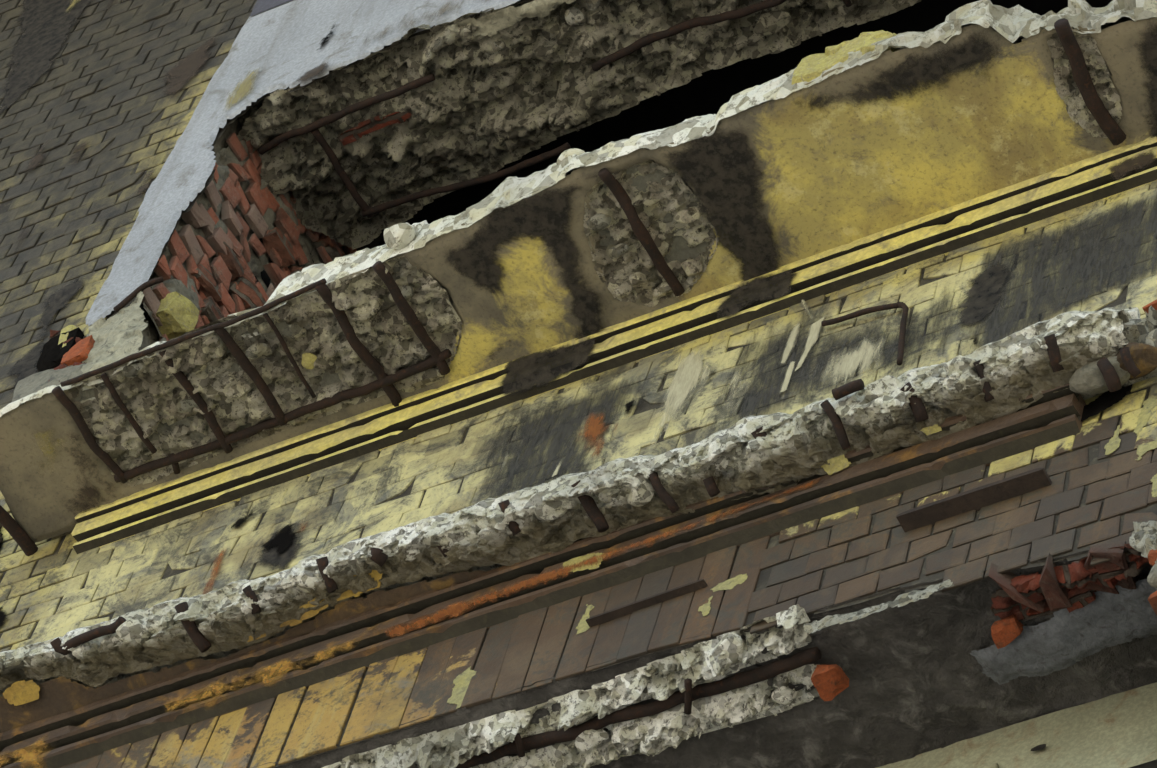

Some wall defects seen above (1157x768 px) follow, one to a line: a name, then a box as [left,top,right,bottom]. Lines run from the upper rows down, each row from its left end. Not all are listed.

rust [0,740,47,768]
rust [165,659,299,711]
rust [314,641,353,661]
leakage [446,186,603,394]
leakage [474,382,639,498]
spalling [0,0,1157,487]
spalling [0,299,1157,709]
rust [387,481,814,637]
spalling [322,579,954,768]
leakage [659,352,709,430]
leakage [665,131,796,318]
leakage [723,195,1157,426]